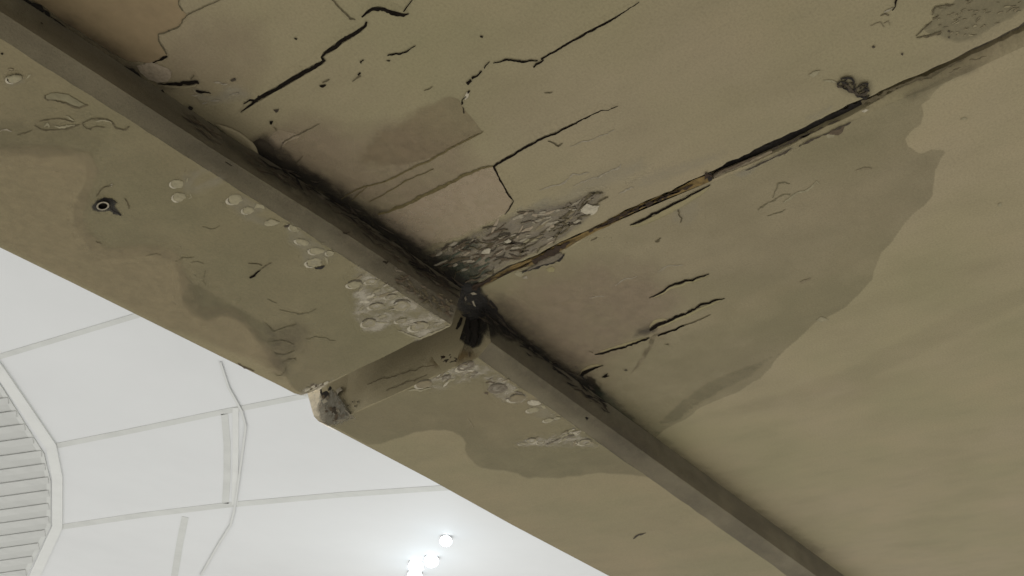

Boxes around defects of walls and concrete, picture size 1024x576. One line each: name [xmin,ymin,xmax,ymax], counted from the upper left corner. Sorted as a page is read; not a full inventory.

water stain [24,0,65,27]
crack [240,0,412,113]
crack [461,1,639,113]
water stain [809,71,869,99]
water stain [247,137,621,413]
peeling [378,166,608,284]
crack [493,103,617,216]
crack [579,274,725,378]
crack [631,185,710,243]
spalling [303,381,358,431]